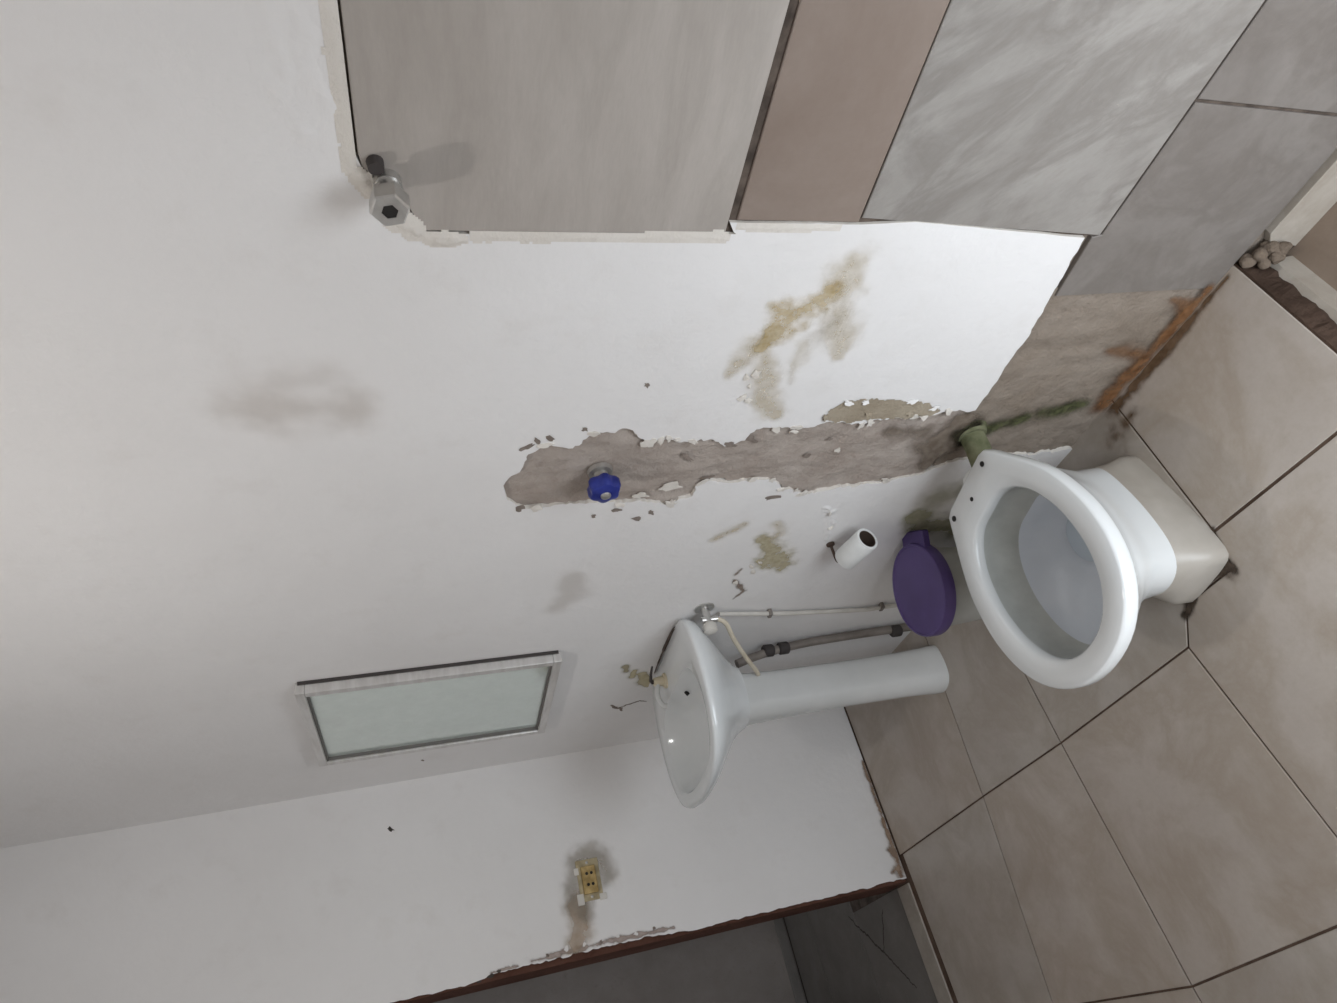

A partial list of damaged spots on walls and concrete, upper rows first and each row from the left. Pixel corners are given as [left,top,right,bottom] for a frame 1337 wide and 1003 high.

water stain [754,284,840,352]
flaking render [504,286,1213,521]